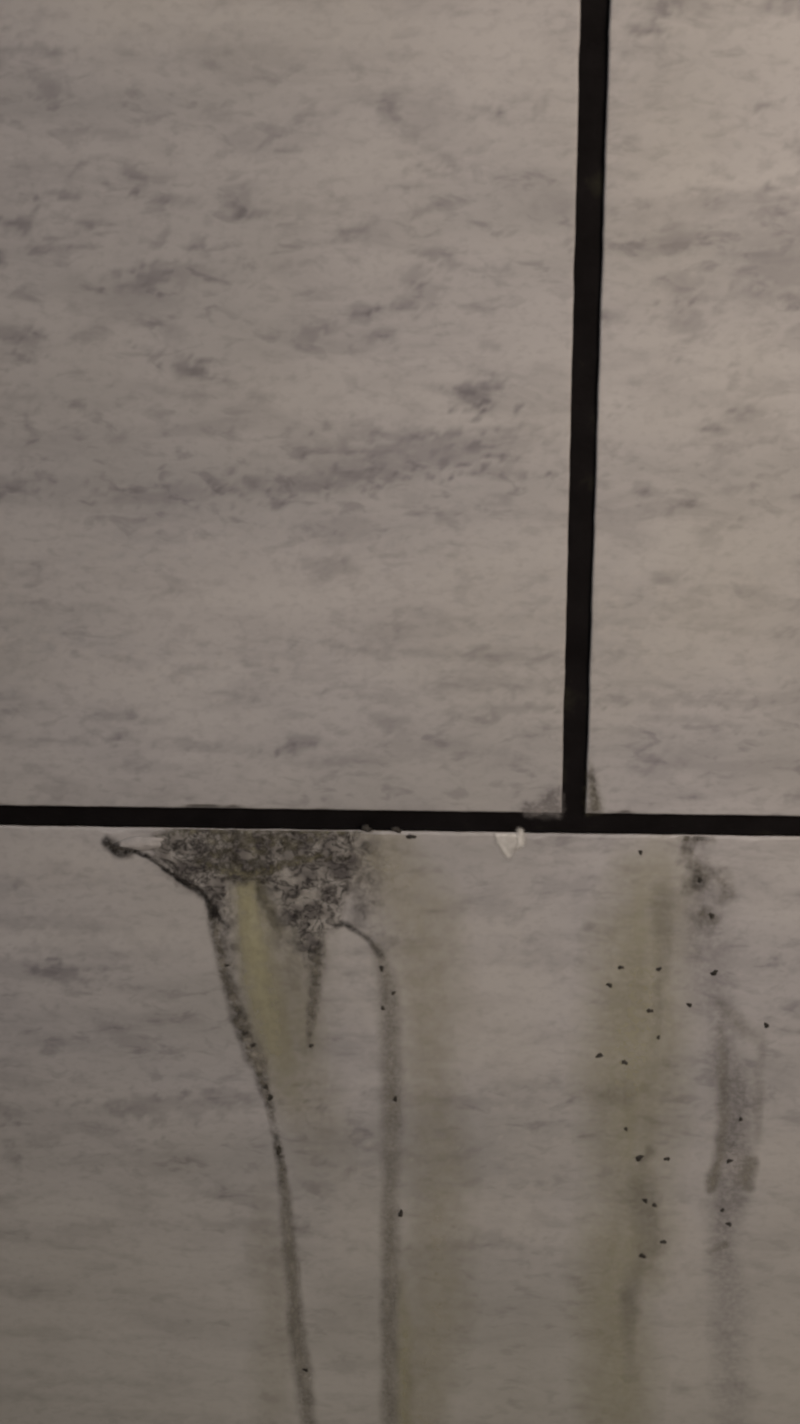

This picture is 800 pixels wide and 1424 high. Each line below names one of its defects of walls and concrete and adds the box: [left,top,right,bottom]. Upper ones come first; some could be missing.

damp [103,824,372,1113]
damp [275,1136,313,1424]
damp [379,955,403,1424]